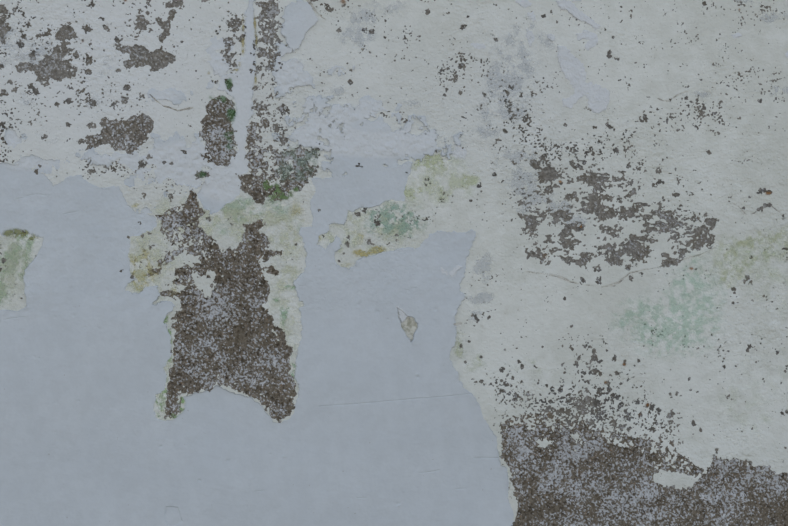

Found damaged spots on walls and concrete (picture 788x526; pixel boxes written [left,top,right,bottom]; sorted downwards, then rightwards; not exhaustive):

peeling [0,0,299,423]
peeling [196,0,788,526]